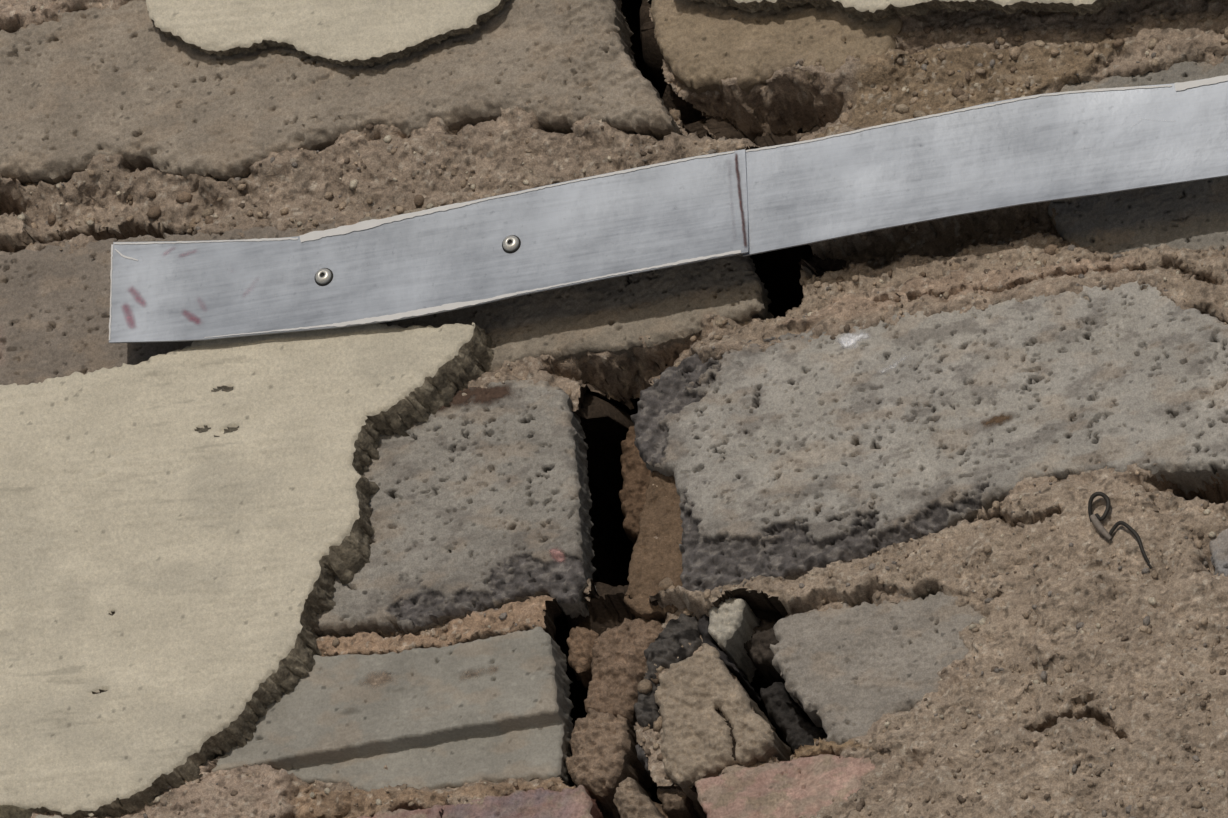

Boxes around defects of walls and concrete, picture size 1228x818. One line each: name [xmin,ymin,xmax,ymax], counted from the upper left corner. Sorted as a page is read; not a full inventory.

flaking render [148,0,509,67]
flaking render [689,0,1128,22]
crack [621,0,820,150]
crack [14,241,29,253]
crack [750,244,846,319]
spalling [624,353,989,623]
flaking render [0,324,494,818]
spalling [389,554,586,627]
crack [543,372,664,788]
crack [711,588,788,624]
crack [715,670,824,761]
crack [635,730,697,804]